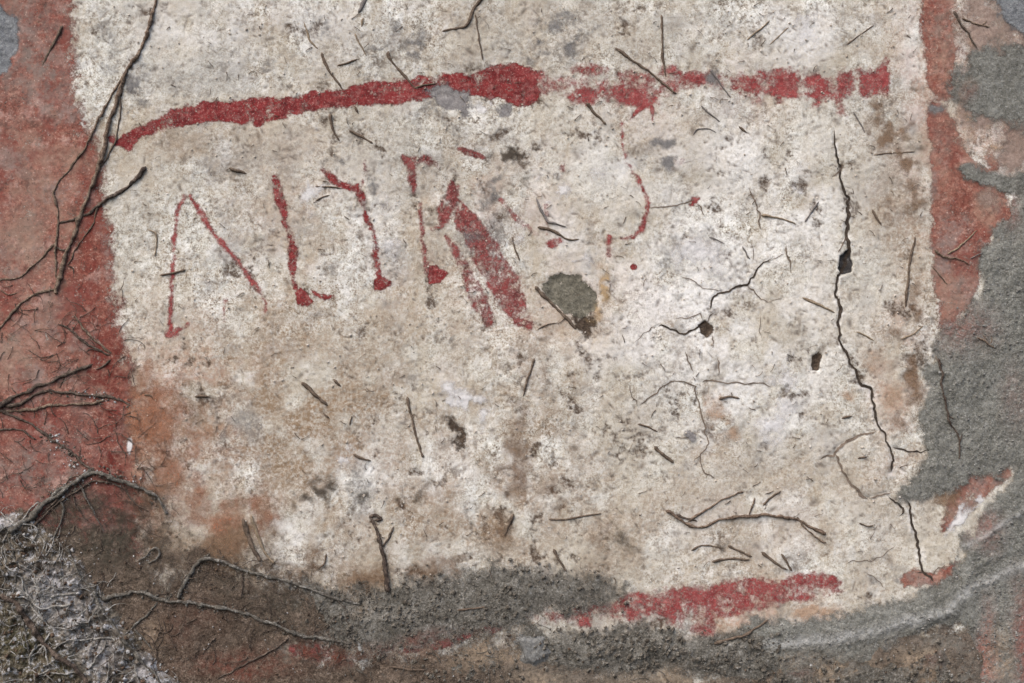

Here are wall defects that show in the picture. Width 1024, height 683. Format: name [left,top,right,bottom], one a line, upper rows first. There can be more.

spalling [542,273,597,339]
crack [629,189,791,478]
crack [821,132,945,587]